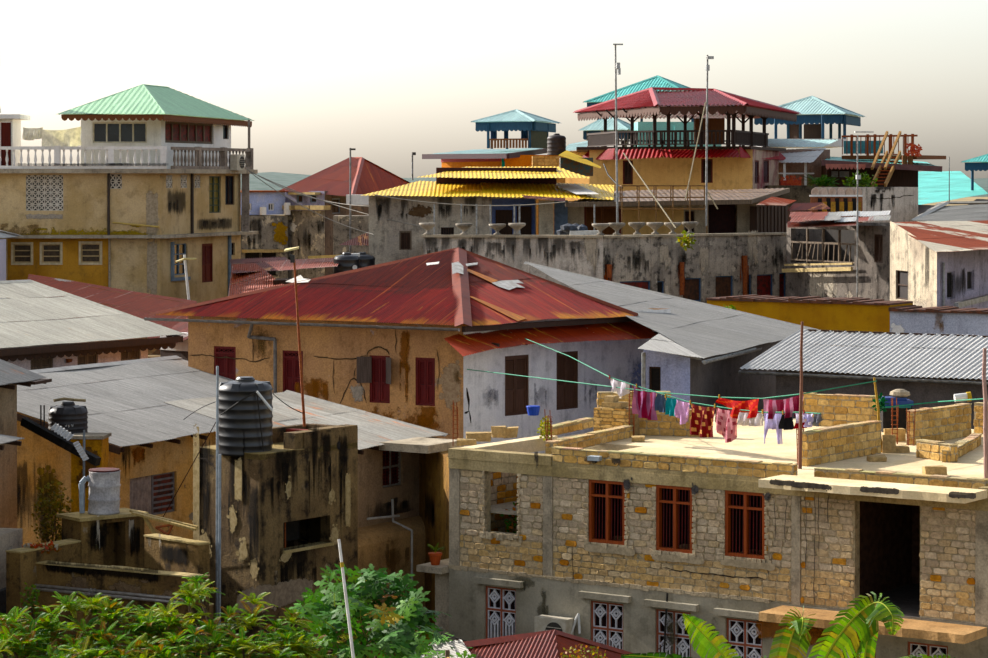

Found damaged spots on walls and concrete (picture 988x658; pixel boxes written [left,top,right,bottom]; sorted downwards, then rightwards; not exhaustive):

rust [467,269,498,283]
leakage [627,245,686,271]
rust [470,296,526,321]
leakage [199,439,210,534]
leakage [228,435,258,561]
leakage [271,450,297,506]
leakage [309,425,347,513]
spalling [226,457,314,613]
leakage [280,544,317,582]